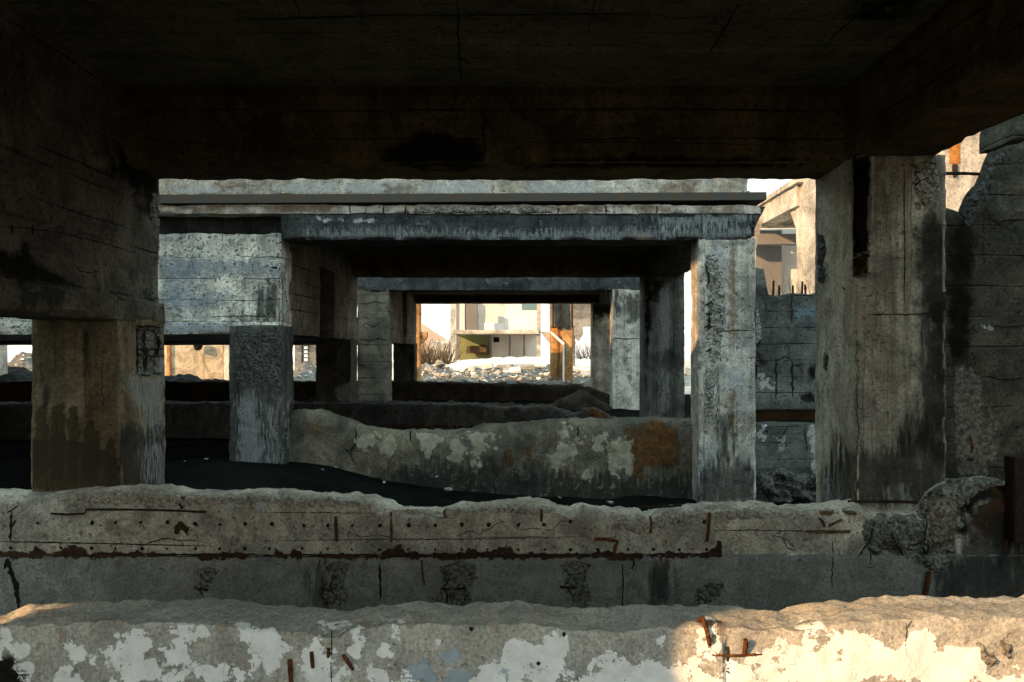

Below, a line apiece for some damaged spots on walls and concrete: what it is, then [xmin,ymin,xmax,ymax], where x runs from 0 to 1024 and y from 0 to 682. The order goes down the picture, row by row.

crack [869,161,938,316]
leakage [32,383,169,509]
peeling [416,429,501,468]
peeling [546,419,635,483]
rust [625,421,680,479]
crack [854,338,864,462]
rust [0,544,157,560]
crack [0,505,213,609]
rust [197,551,251,561]
rust [319,540,721,561]
peeling [0,561,419,682]
peeling [435,583,1024,682]